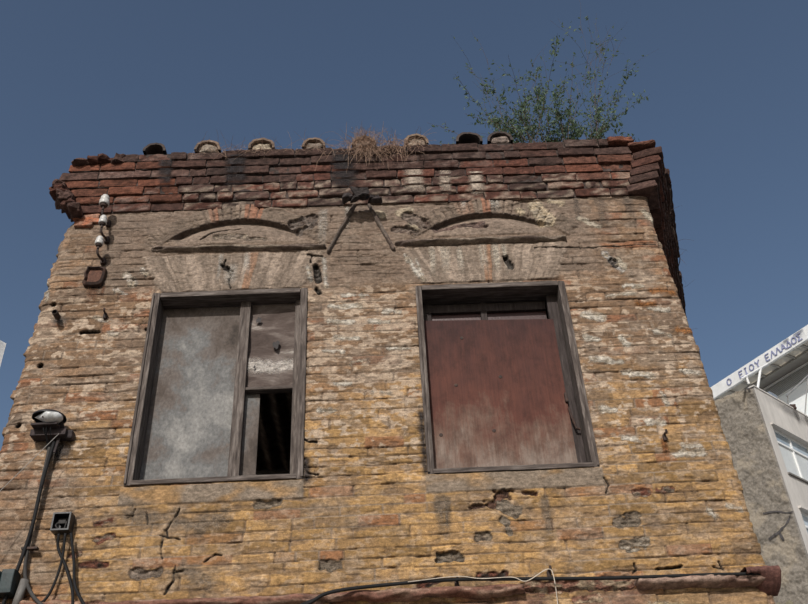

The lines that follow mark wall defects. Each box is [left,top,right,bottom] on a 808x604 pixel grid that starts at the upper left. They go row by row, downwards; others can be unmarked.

spalling [469,490,537,536]
spalling [475,531,492,542]
crack [133,510,182,595]
spalling [435,550,465,563]
spalling [319,559,343,572]